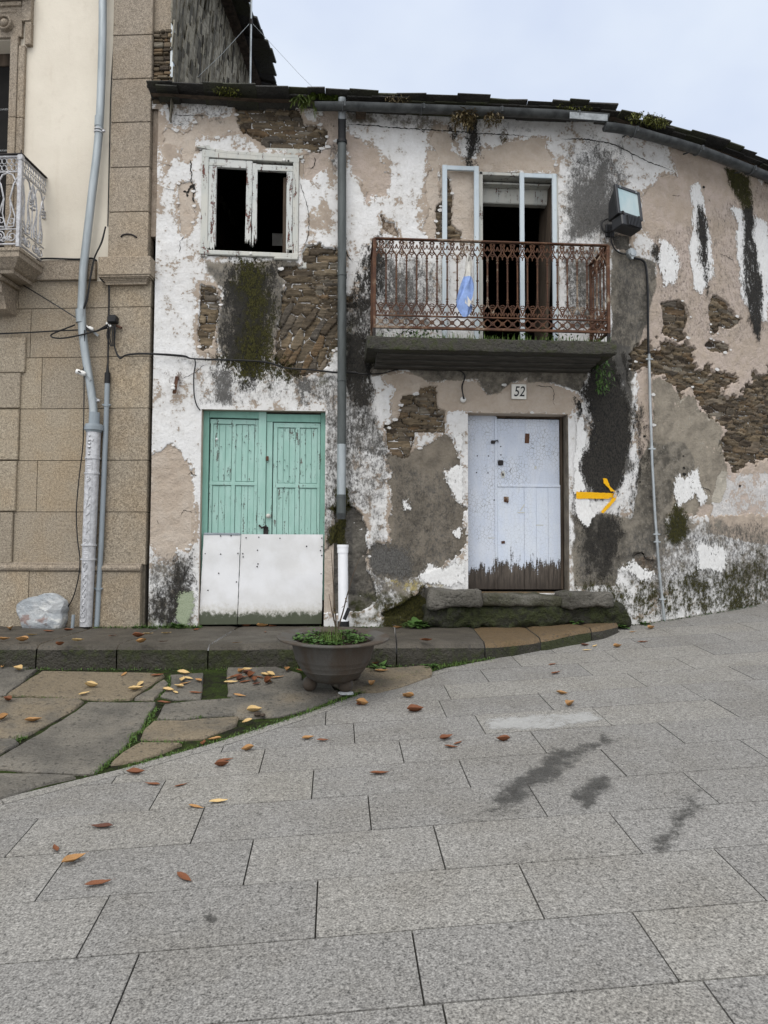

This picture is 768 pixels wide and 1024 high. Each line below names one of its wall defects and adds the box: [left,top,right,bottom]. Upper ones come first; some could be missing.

flaking render [197,285,223,351]
damp [209,257,284,405]
flaking render [234,108,391,204]
flaking render [275,242,355,379]
flaking render [380,216,399,237]
damp [561,135,630,249]
flaking render [628,148,768,519]
damp [729,205,768,342]
damp [148,549,198,627]
peeling [324,373,580,614]
damp [569,352,655,589]
damp [664,470,729,573]